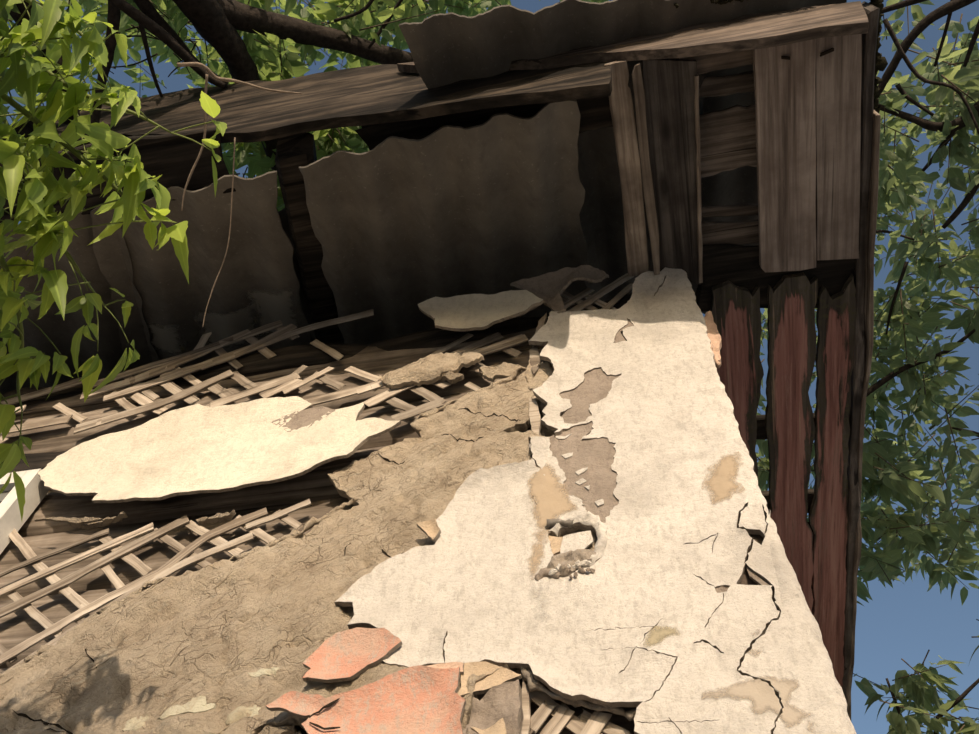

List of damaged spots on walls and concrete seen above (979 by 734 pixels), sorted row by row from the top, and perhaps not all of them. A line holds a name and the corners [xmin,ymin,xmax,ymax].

flaking render [418,265,609,348]
crack [443,408,537,467]
spalling [0,351,637,734]
crack [737,505,768,562]
crack [740,589,781,675]
crack [12,709,73,734]